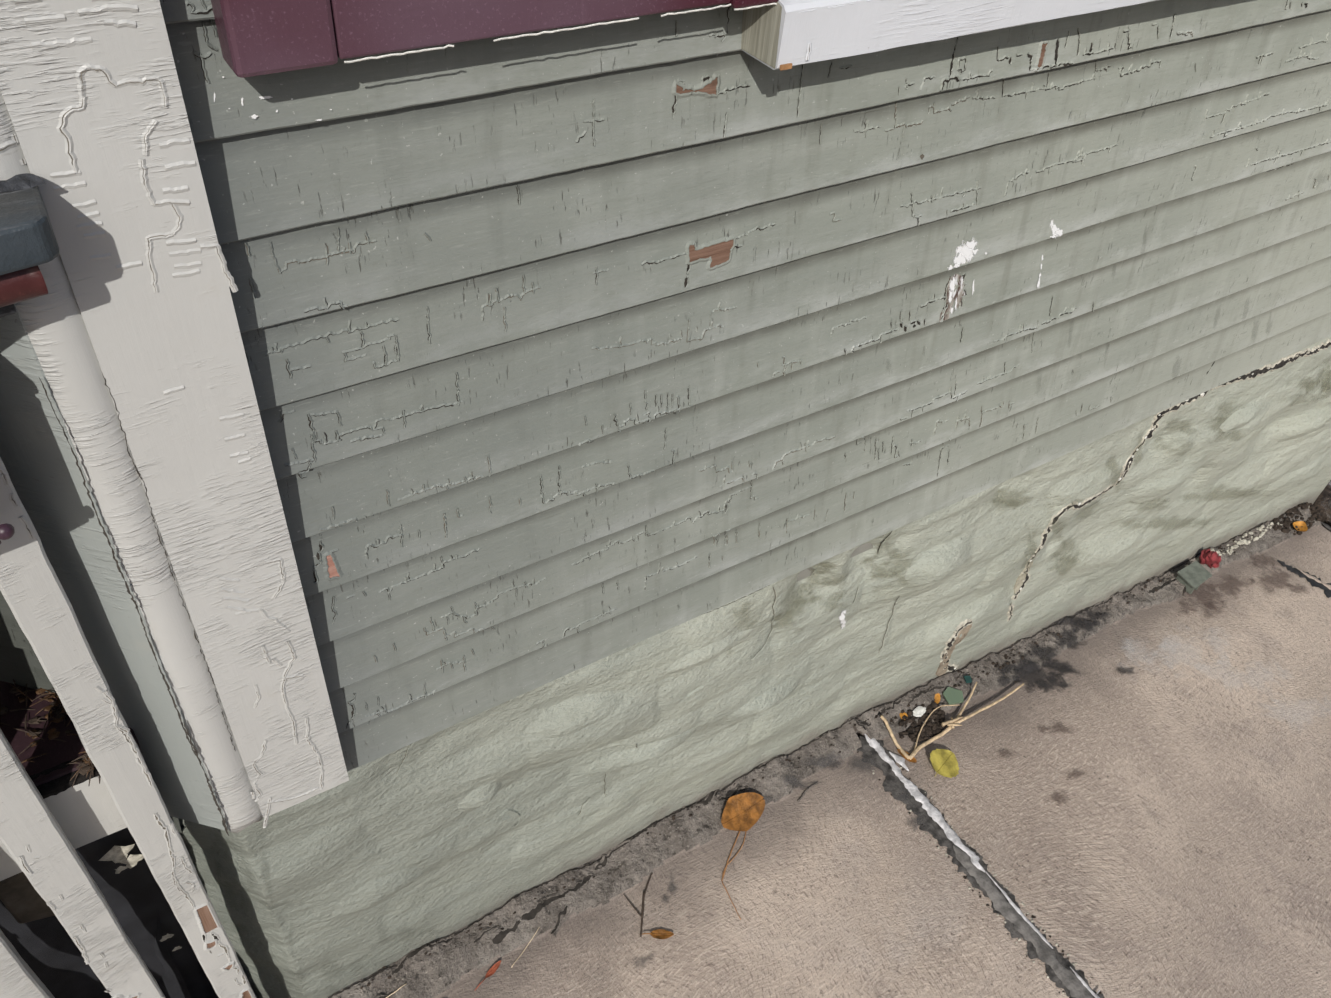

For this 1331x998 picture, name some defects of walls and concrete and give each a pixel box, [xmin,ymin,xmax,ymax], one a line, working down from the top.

crack [185,0,218,83]
peeling [672,73,751,119]
crack [0,64,377,299]
peeling [641,222,776,288]
peeling [939,273,967,322]
crack [265,297,464,479]
crack [0,465,36,539]
crack [1007,339,1331,638]
peeling [193,902,221,950]
peeling [239,987,256,998]